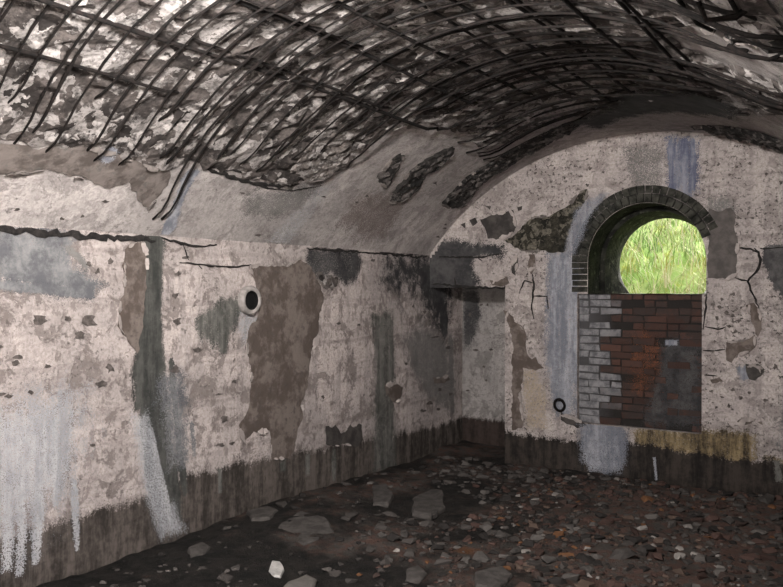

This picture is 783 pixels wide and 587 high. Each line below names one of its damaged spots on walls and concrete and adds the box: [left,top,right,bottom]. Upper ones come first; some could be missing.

spalling [0,0,783,220]
crack [0,225,251,269]
spalling [461,167,592,287]
crack [736,247,783,308]
flaking render [215,259,338,460]
damp [0,167,783,587]
flaking render [503,310,543,430]